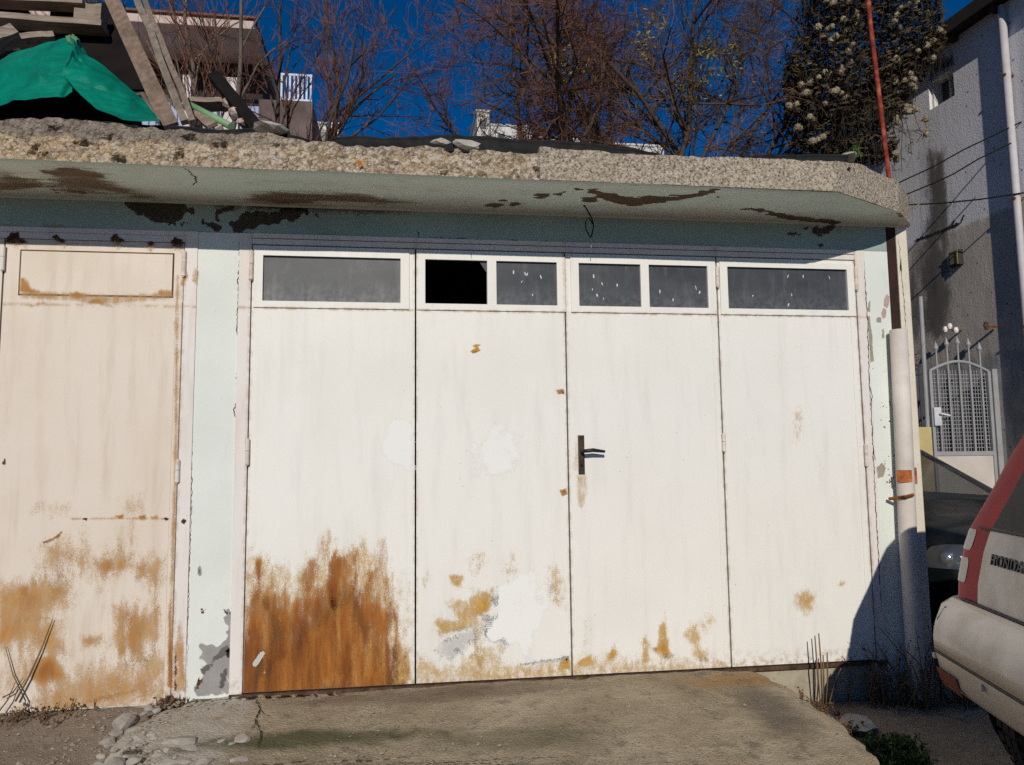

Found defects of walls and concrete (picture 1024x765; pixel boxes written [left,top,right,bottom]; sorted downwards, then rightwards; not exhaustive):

leakage [0,165,162,203]
flaking render [124,202,410,233]
flaking render [484,200,521,208]
flaking render [534,188,721,206]
flaking render [740,208,842,248]
corrosion [0,271,198,710]
corrosion [243,532,726,693]
corrosion [796,589,814,613]
flaking render [194,609,231,696]
peeling [434,630,475,661]
crack [251,697,271,748]